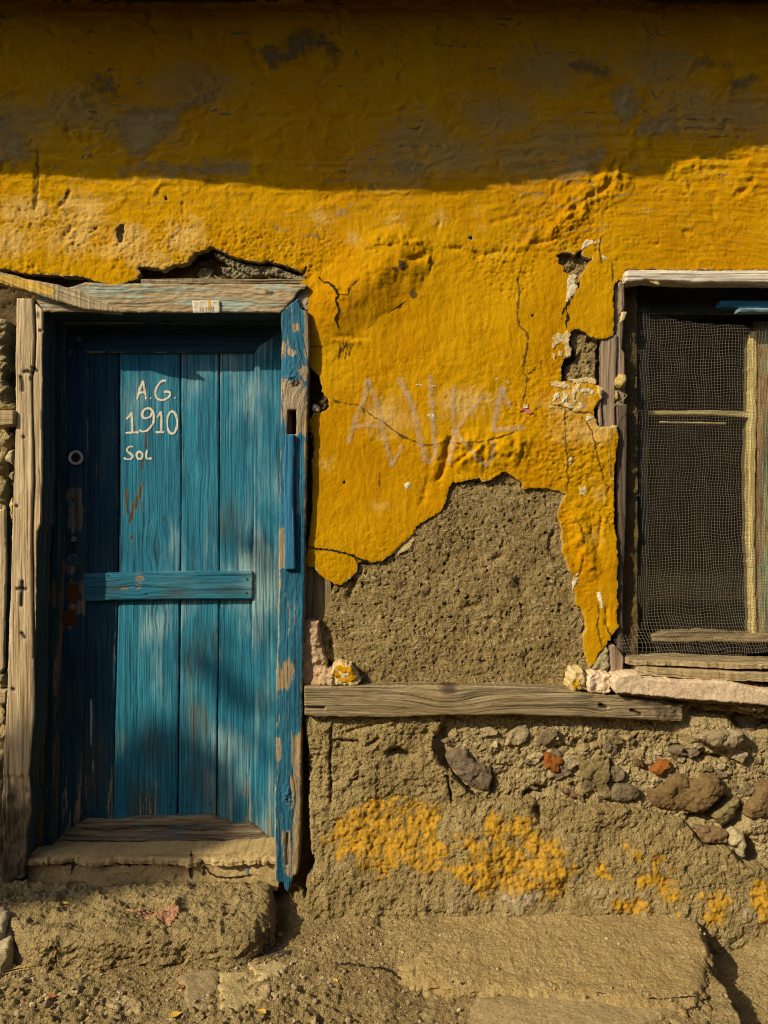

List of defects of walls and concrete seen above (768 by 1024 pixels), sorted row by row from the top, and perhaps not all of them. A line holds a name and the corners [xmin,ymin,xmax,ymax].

spalling [139,252,309,310]
crack [310,276,359,347]
spalling [556,239,608,302]
crack [330,269,543,446]
spalling [548,330,604,421]
spalling [319,472,600,687]
spalling [433,699,768,869]